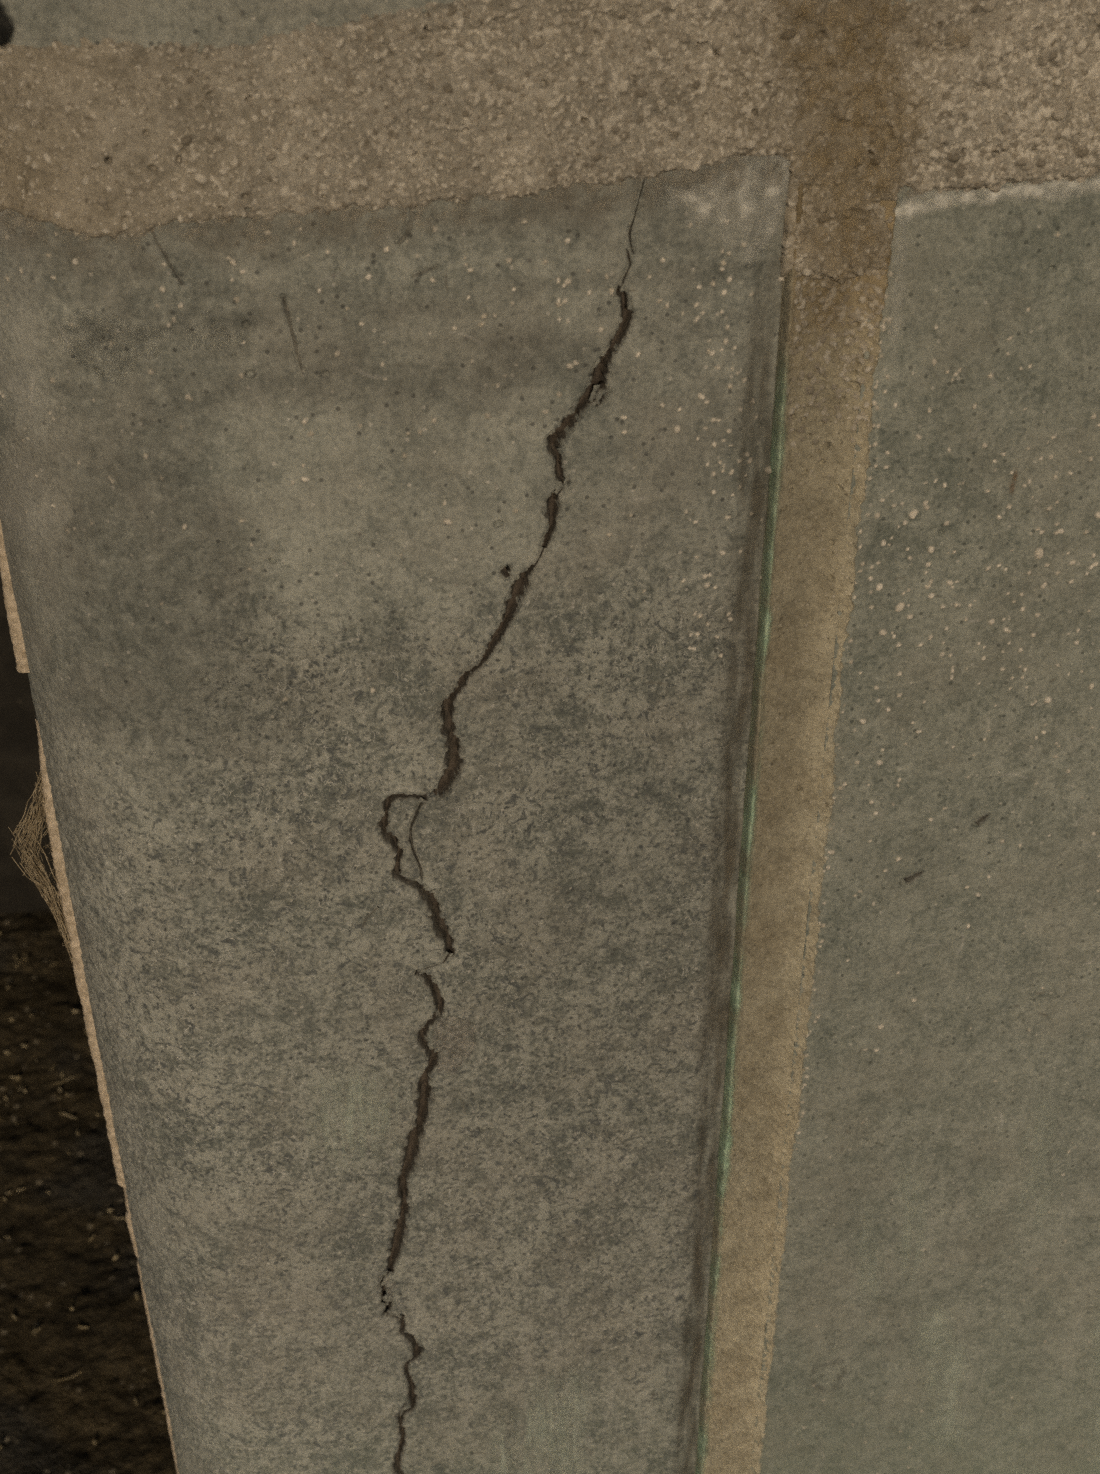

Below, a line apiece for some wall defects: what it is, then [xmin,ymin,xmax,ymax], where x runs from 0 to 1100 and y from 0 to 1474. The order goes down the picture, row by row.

crack [360,178,647,1474]